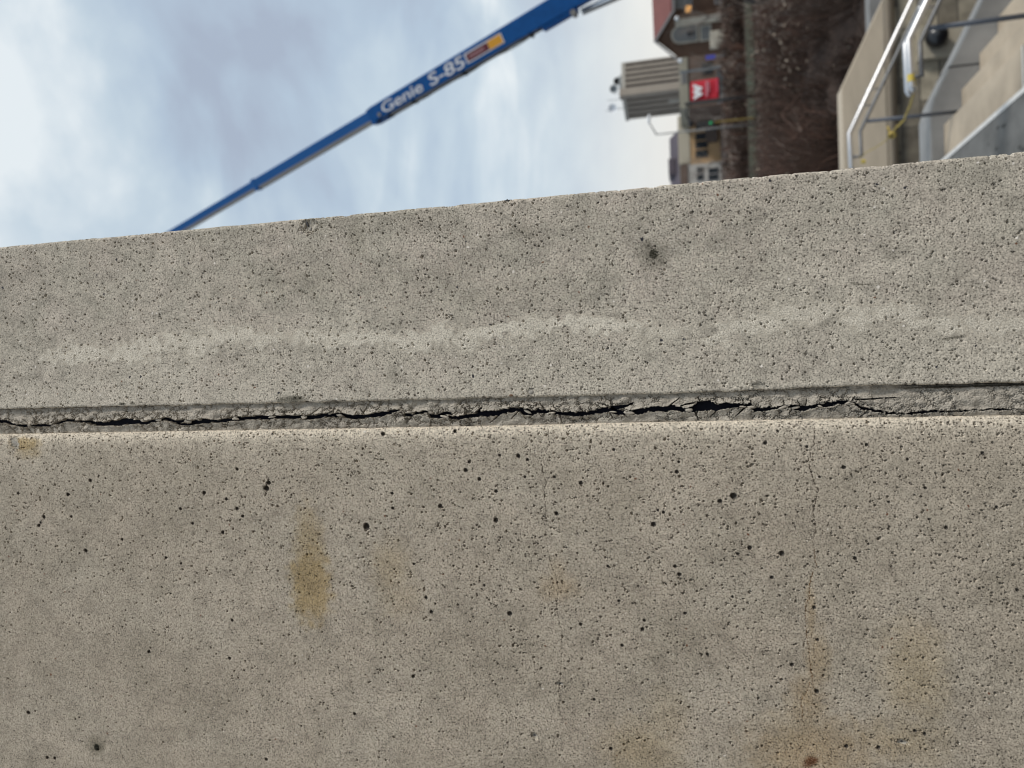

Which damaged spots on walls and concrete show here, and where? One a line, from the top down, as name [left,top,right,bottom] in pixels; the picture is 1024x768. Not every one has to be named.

crack [0,397,1008,720]